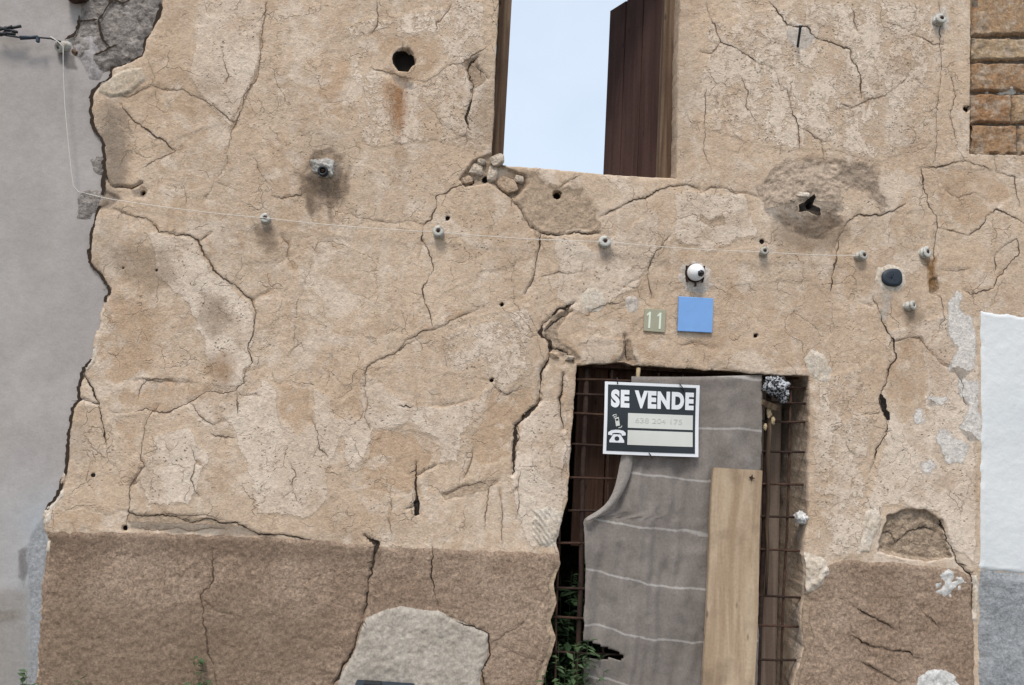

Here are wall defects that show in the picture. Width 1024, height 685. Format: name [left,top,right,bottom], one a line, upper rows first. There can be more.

spalling [71,0,162,98]
crack [45,0,310,682]
crack [357,184,473,430]
crack [373,45,487,141]
spalling [459,153,601,236]
crack [448,236,669,539]
crack [501,90,757,293]
crack [703,8,826,156]
crack [771,3,1021,473]
peeling [914,291,982,473]
crack [333,462,429,684]
spalling [859,508,952,562]